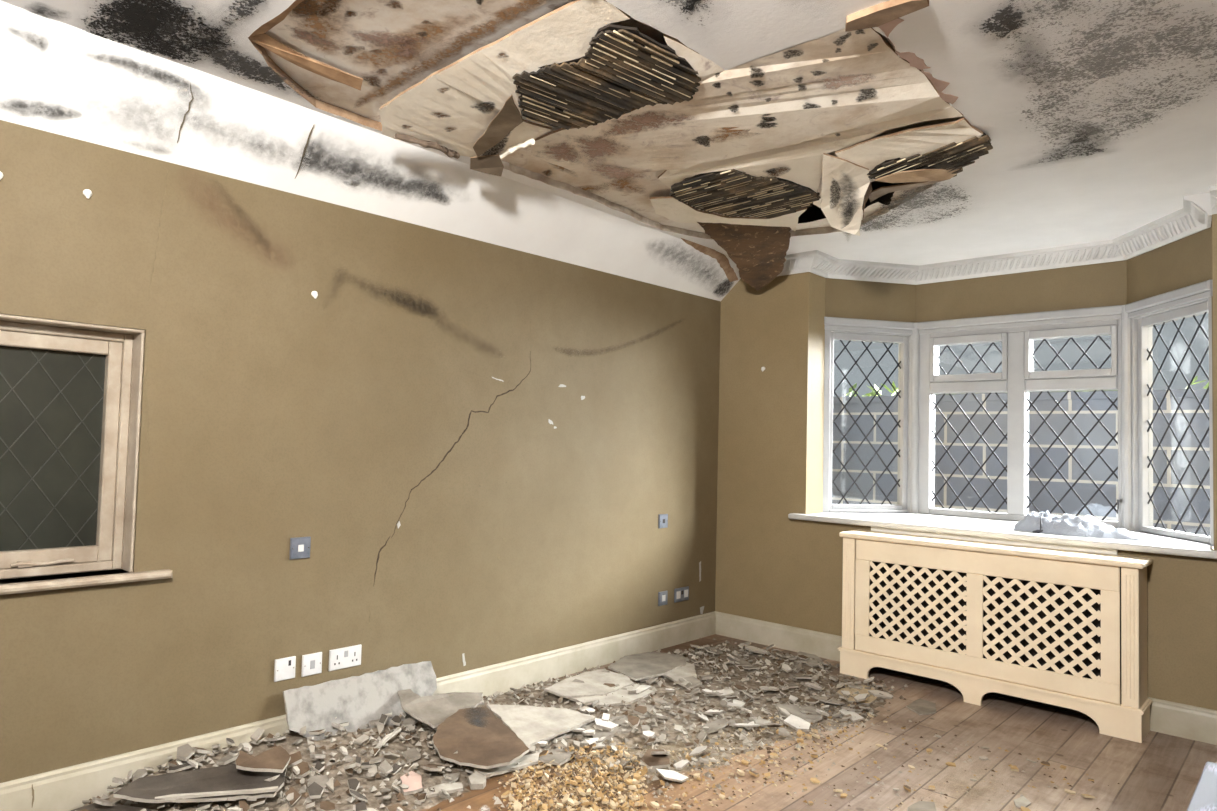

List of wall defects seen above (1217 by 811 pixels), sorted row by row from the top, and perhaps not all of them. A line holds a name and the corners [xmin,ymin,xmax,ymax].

damp [30,6,61,17]
damp [666,0,714,26]
damp [82,0,325,104]
peeling [878,18,958,104]
damp [979,0,1217,163]
damp [4,102,73,117]
damp [473,102,494,113]
damp [482,133,510,156]
damp [301,145,445,202]
flaking render [681,238,738,282]
crack [363,324,531,643]